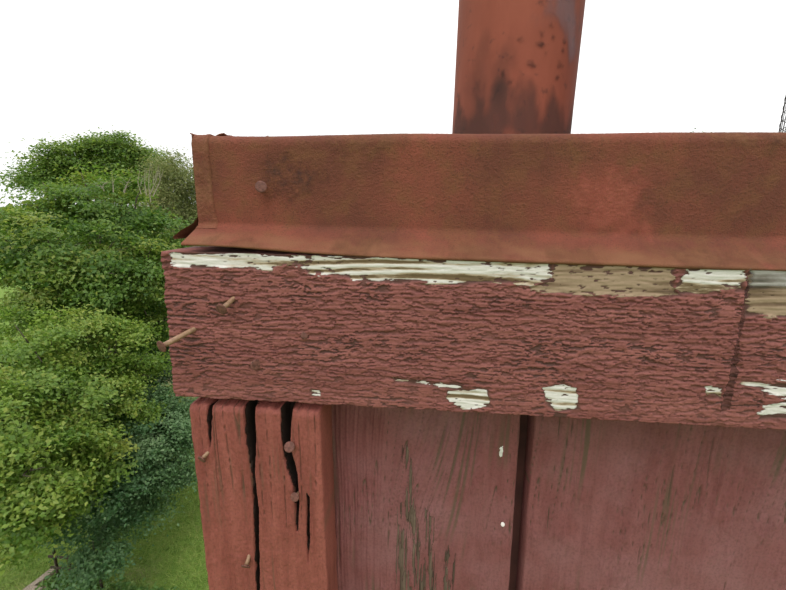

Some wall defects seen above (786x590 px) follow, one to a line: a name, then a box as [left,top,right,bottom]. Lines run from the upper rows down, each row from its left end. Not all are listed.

peeling [170,252,786,319]
peeling [393,377,490,410]
peeling [542,384,578,411]
peeling [704,386,722,396]
peeling [739,379,786,415]
crack [207,400,218,445]
crack [245,400,260,590]
crack [280,401,310,550]